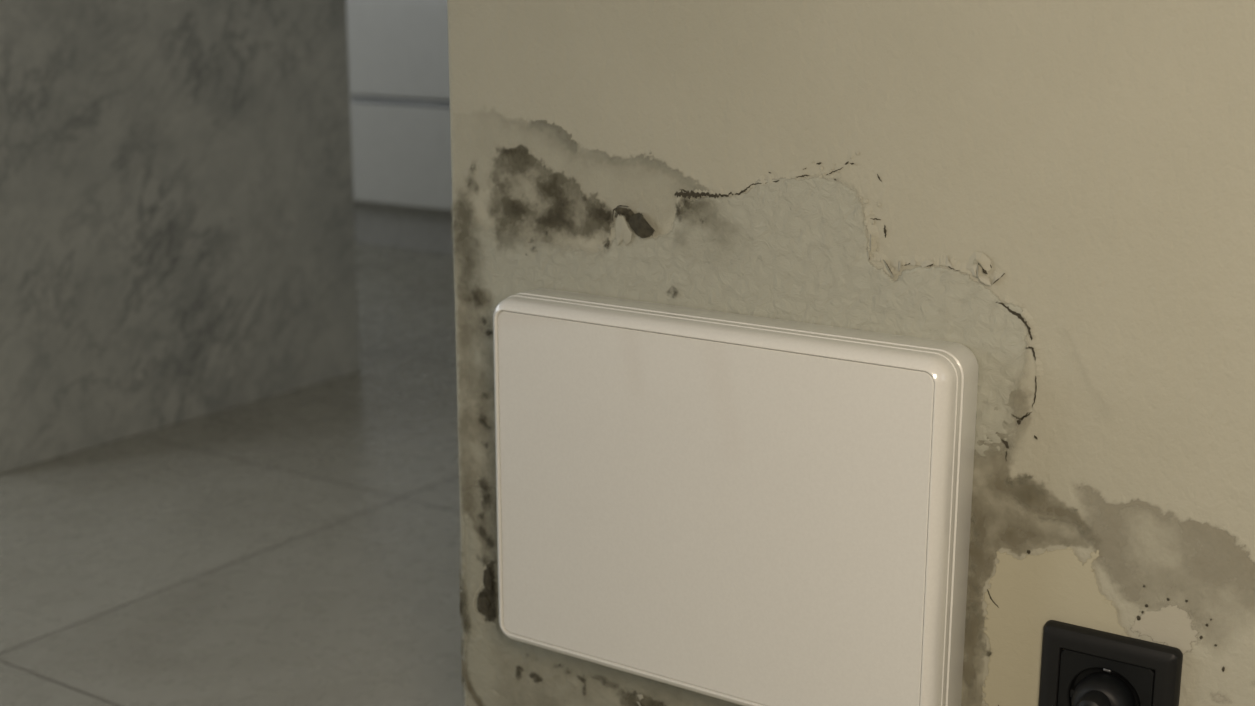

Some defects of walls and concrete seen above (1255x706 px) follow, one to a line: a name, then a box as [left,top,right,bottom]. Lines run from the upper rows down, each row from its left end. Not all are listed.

damp [453,187,487,305]
damp [490,145,612,248]
flaking render [467,177,1027,454]
damp [463,474,497,564]
damp [963,454,1255,703]
damp [459,573,484,706]
damp [516,666,542,683]
damp [604,681,664,706]